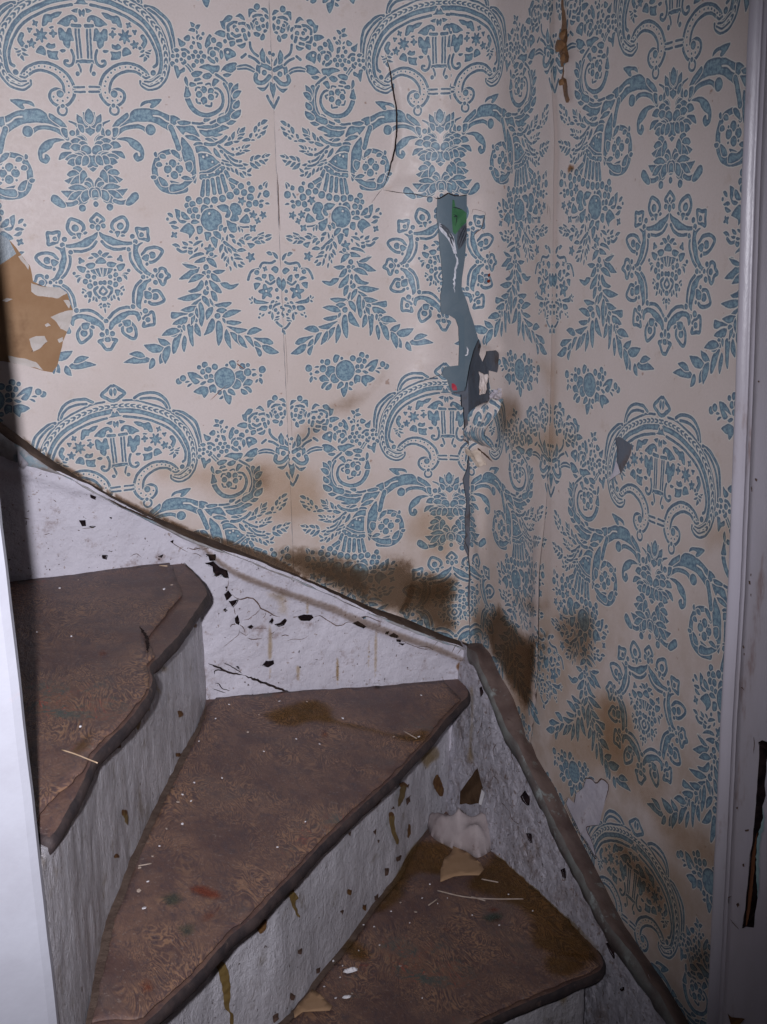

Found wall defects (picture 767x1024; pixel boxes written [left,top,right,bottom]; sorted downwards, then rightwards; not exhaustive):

crack [372,58,485,235]
peeling [8,283,73,370]
damp [38,450,451,626]
peeling [205,543,253,629]
peeling [269,614,313,627]
crack [208,575,384,693]
damp [490,612,534,703]
flaking render [564,778,609,859]